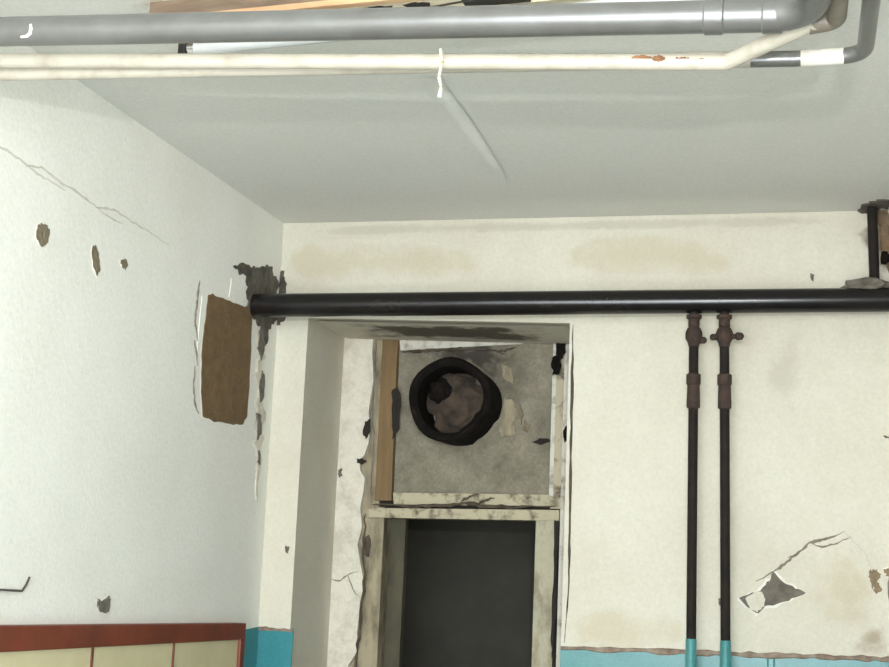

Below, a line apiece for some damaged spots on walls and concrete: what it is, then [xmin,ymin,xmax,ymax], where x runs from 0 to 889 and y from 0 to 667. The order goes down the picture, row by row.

crack [0,146,169,245]
flaking render [35,221,50,248]
flaking render [91,244,101,278]
flaking render [197,263,287,500]
flaking render [94,591,113,619]
flaking render [737,570,806,616]
crack [757,532,889,598]
flaking render [868,567,889,594]